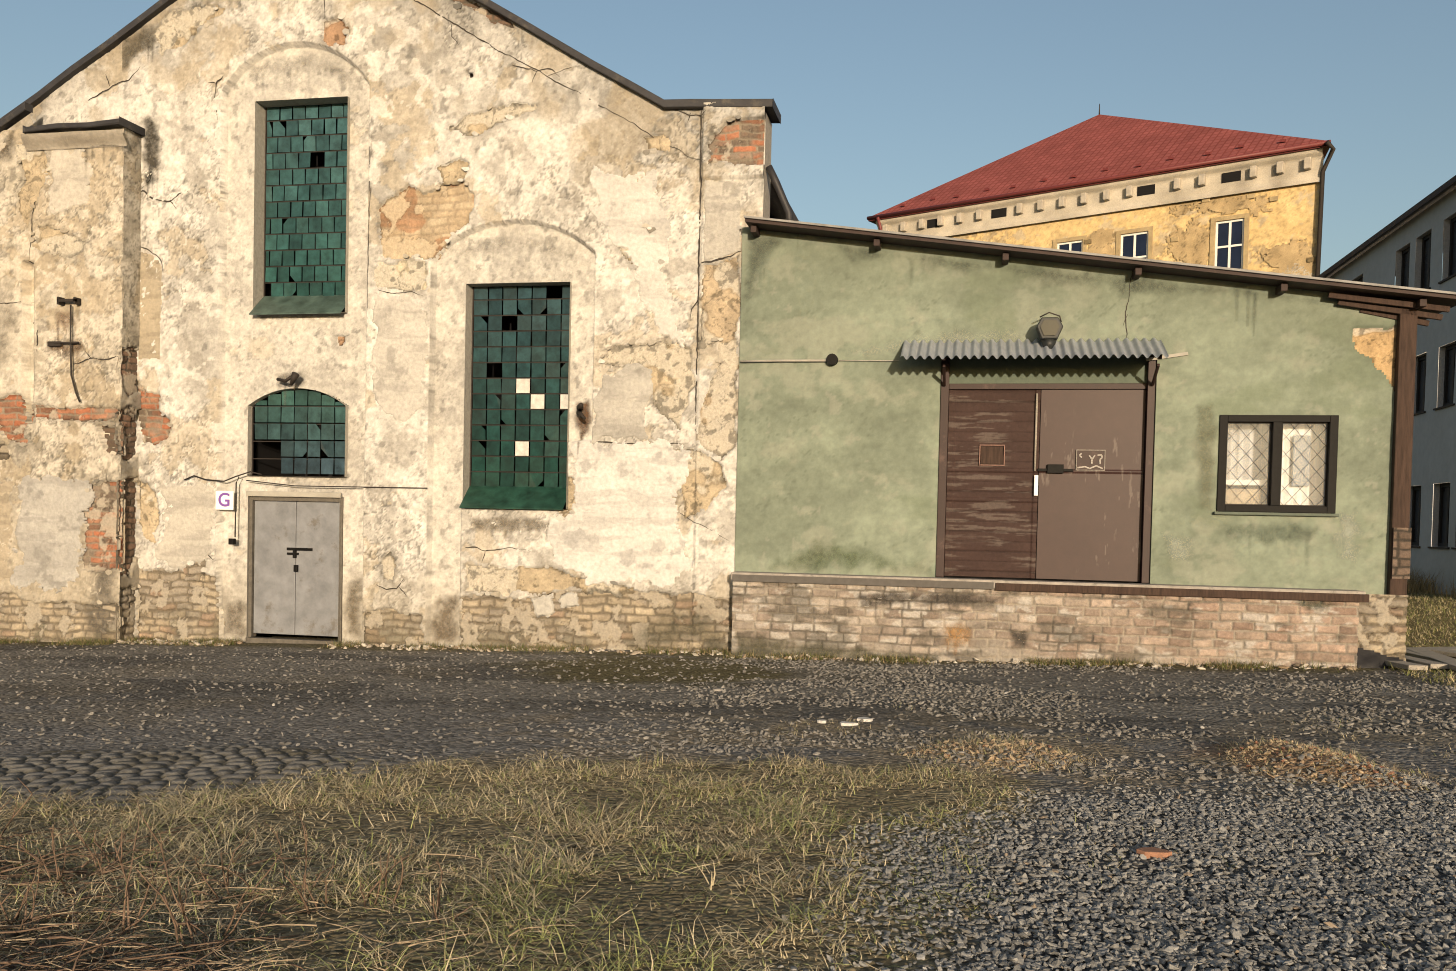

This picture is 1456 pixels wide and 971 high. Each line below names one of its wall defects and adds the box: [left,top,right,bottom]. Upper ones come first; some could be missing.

flaking render [318,13,350,47]
crack [367,148,417,308]
flaking render [374,158,474,302]
crack [414,0,741,444]
flaking render [708,115,765,186]
flaking render [598,248,741,519]
flaking render [1352,325,1397,391]
flaking render [0,346,225,643]
flaking render [364,608,426,646]
flaking render [459,564,733,652]